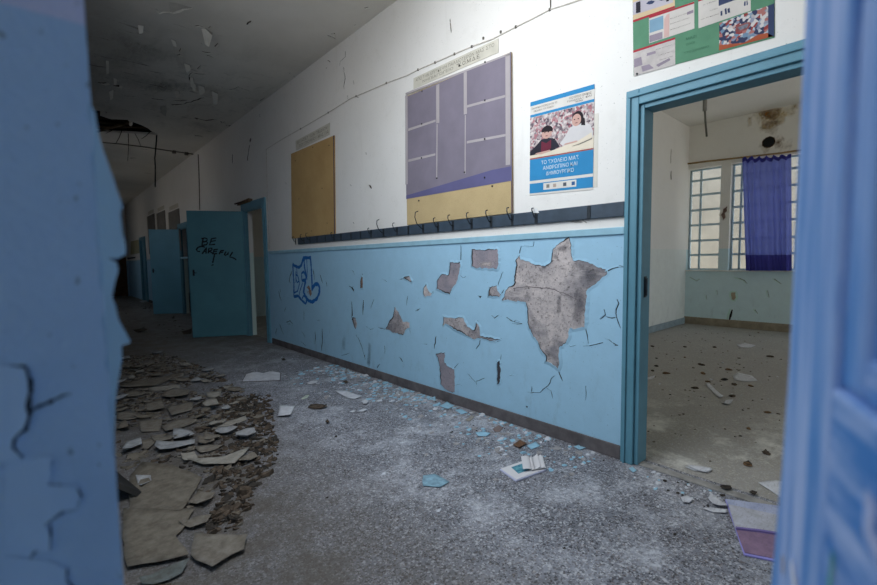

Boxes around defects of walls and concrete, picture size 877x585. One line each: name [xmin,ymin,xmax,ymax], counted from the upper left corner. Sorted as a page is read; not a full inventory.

peeling [88,103,131,455]
peeling [379,306,411,336]
peeling [400,237,623,381]
crack [583,299,621,346]
peeling [435,351,462,394]
crack [527,377,553,398]
peeling [0,365,80,585]